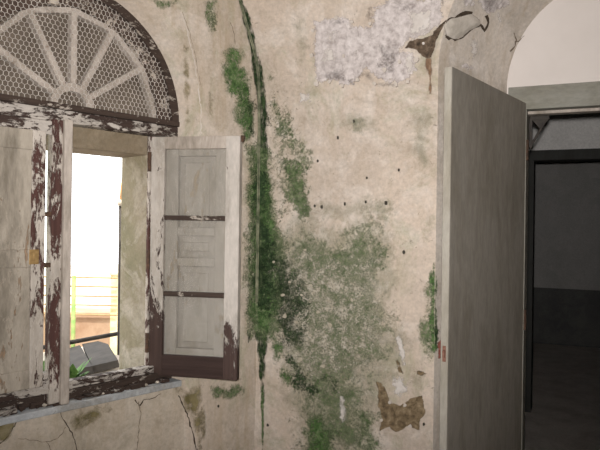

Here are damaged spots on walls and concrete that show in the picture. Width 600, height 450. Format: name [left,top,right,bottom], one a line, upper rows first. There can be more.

flaking render [309,0,444,88]
water stain [222,0,391,450]
water stain [419,264,440,356]
crack [135,394,160,448]
crack [178,395,198,450]
flaking render [376,336,425,432]